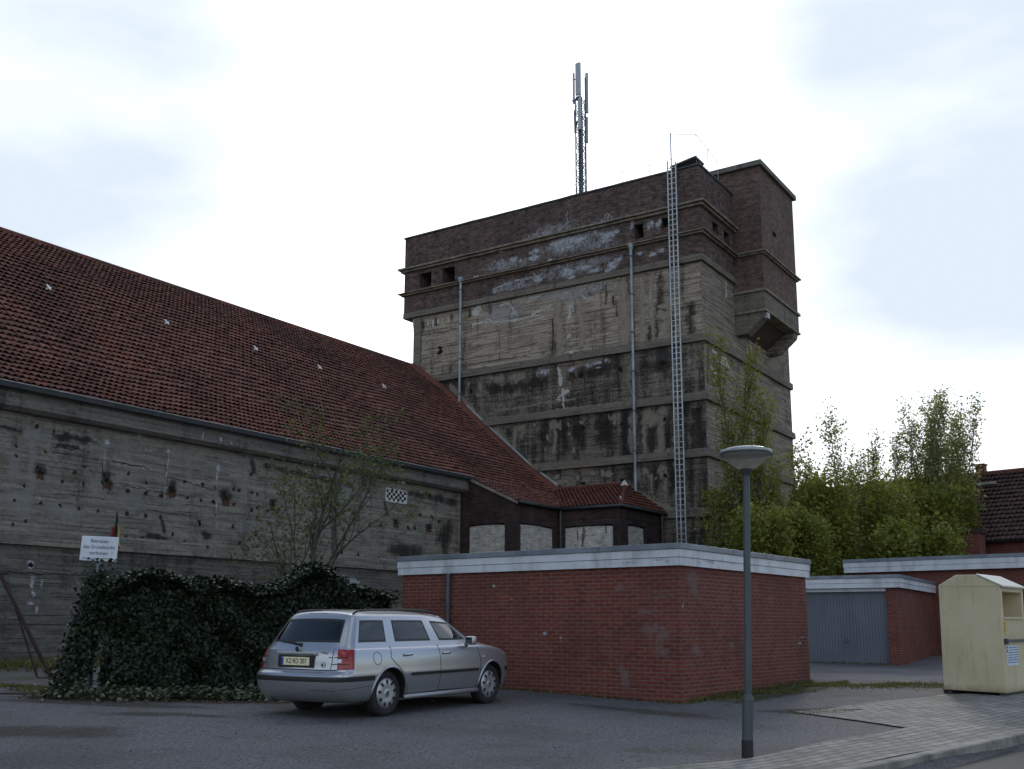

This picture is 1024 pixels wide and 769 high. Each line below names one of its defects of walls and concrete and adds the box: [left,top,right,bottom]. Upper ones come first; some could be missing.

leakage [647,269,695,341]
leakage [487,358,611,409]
leakage [54,432,110,464]
leakage [647,416,670,452]
spalling [34,461,46,480]
spalling [101,472,112,490]
spalling [220,490,231,506]